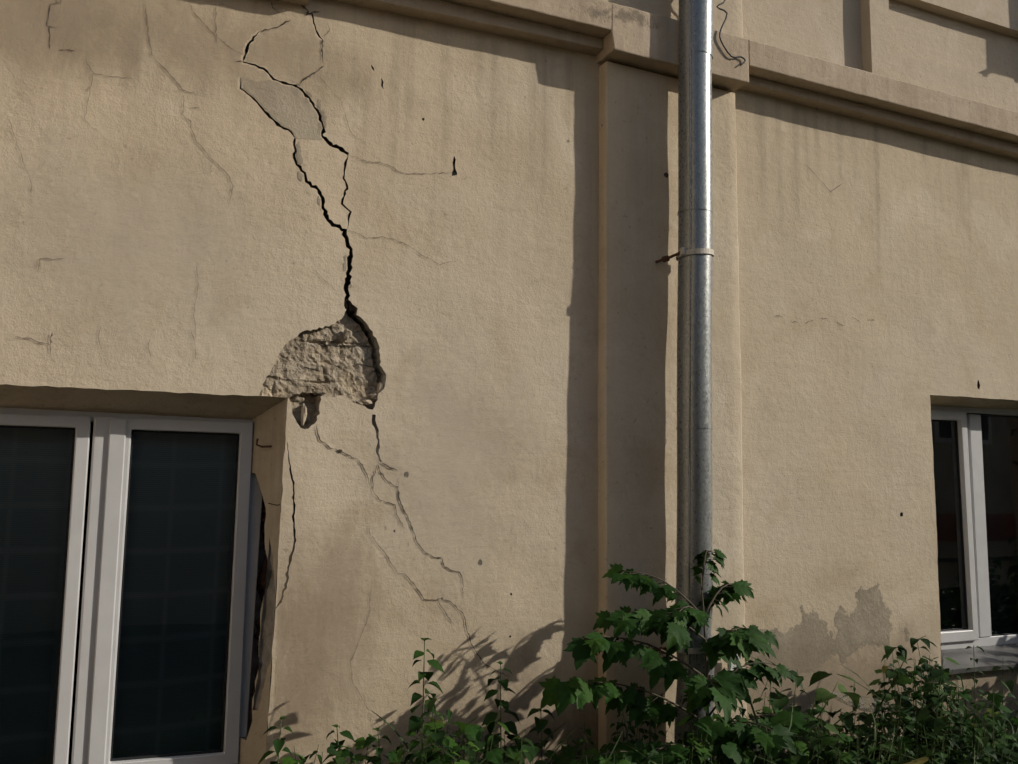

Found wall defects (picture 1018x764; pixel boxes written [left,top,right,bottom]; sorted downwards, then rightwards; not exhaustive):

crack [46,0,132,125]
crack [145,8,233,203]
crack [191,3,456,312]
flaking render [259,299,386,429]
flaking render [240,496,280,740]
crack [268,443,296,608]
crack [316,414,507,676]